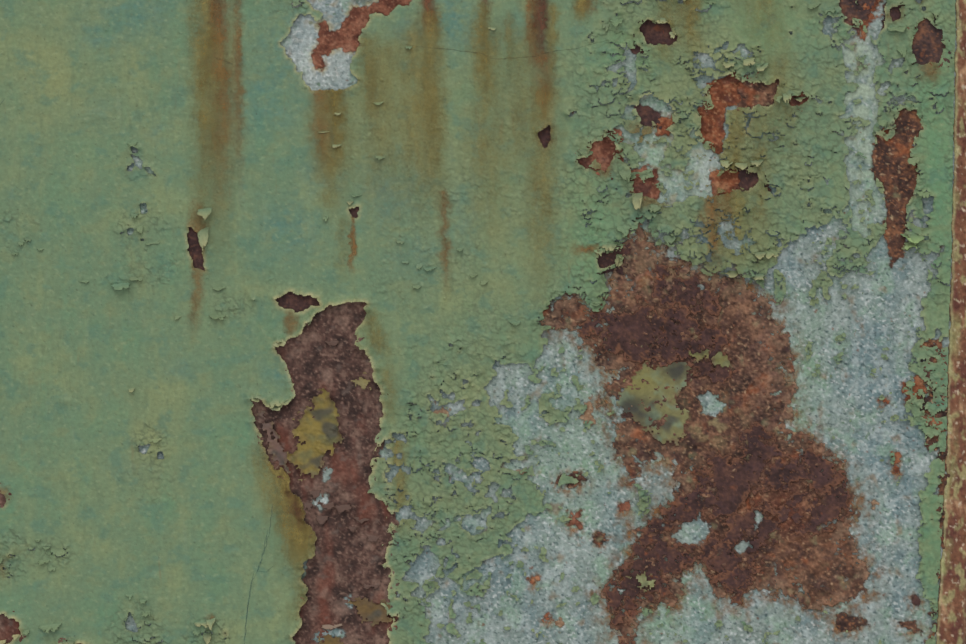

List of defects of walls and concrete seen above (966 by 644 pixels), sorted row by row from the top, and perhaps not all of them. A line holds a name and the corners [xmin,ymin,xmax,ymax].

peeling [276,0,422,99]
corrosion [526,0,556,113]
peeling [179,207,217,278]
peeling [341,195,366,222]
peeling [523,0,954,644]
corrosion [936,0,966,644]
peeling [245,284,645,644]
corrosion [533,184,879,644]
peeling [0,605,96,644]
corrosion [898,620,923,634]